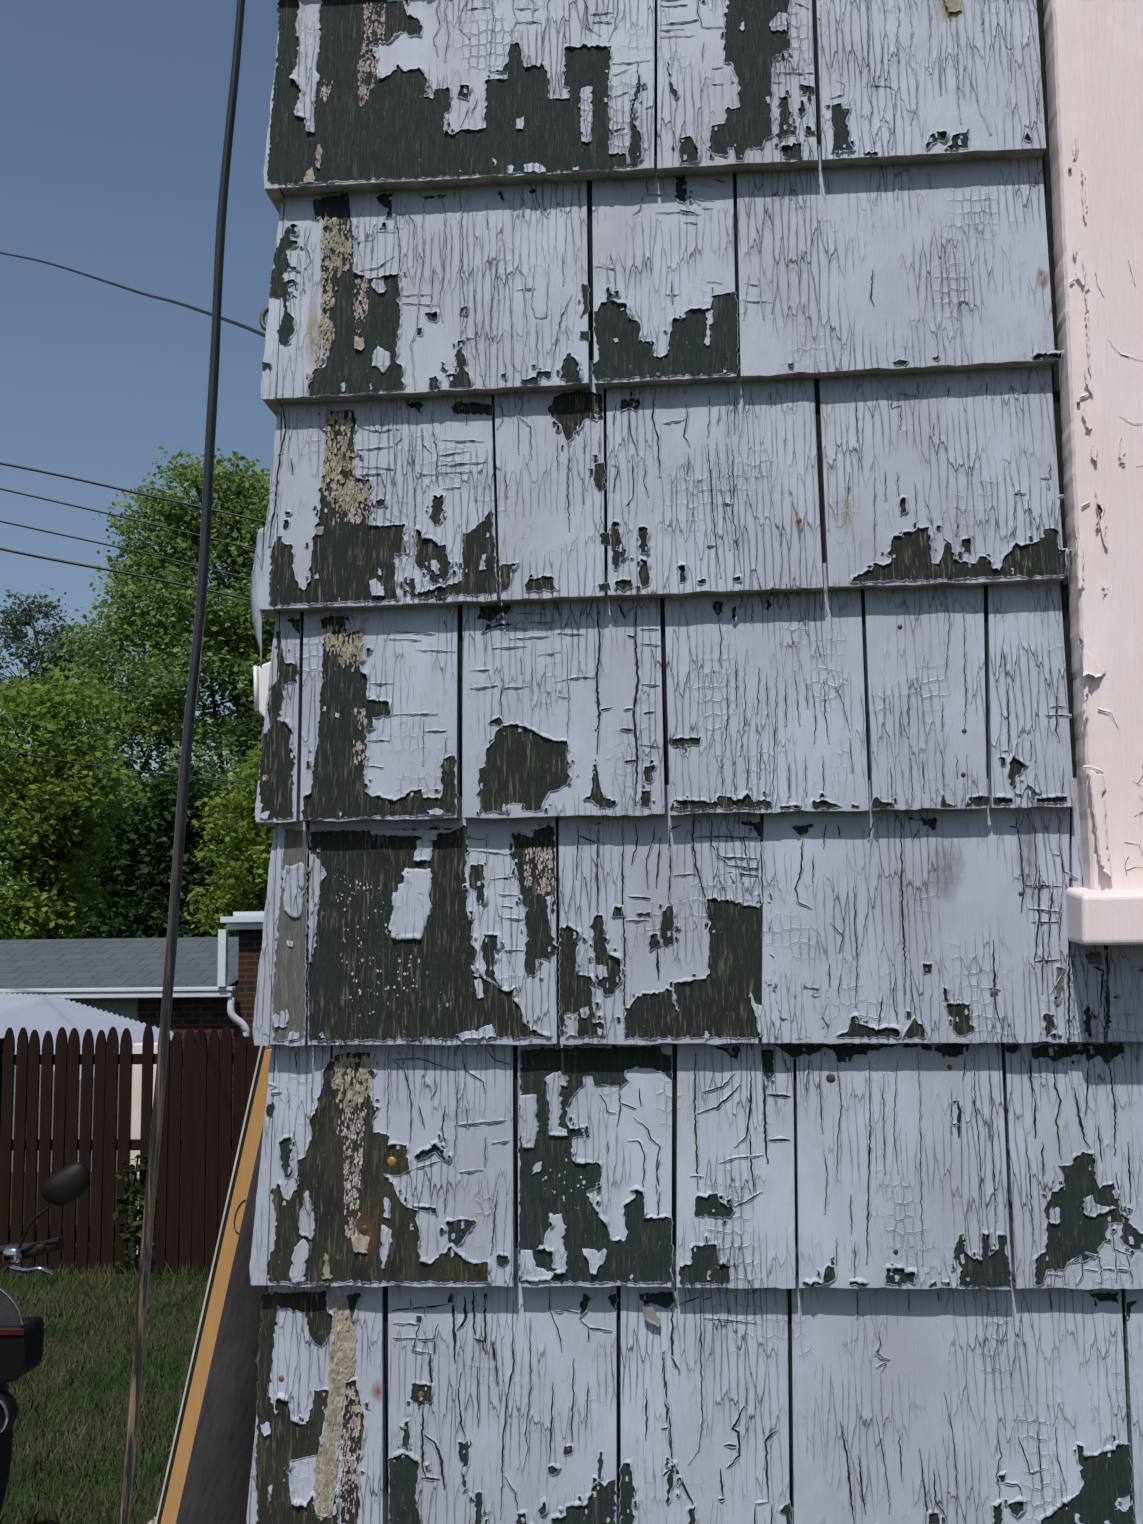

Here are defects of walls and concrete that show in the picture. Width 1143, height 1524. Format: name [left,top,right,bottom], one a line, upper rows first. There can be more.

crack [773,0,1079,201]
peeling [1030,350,1064,361]
peeling [1075,260,1091,375]
peeling [848,494,1084,591]
peeling [1095,490,1108,551]
peeling [1078,637,1106,734]
peeling [250,0,977,1524]
peeling [637,753,1068,840]
peeling [802,1229,1012,1288]
peeling [1031,1150,1143,1288]
crack [838,1392,1066,1524]
peeling [988,1434,1136,1524]